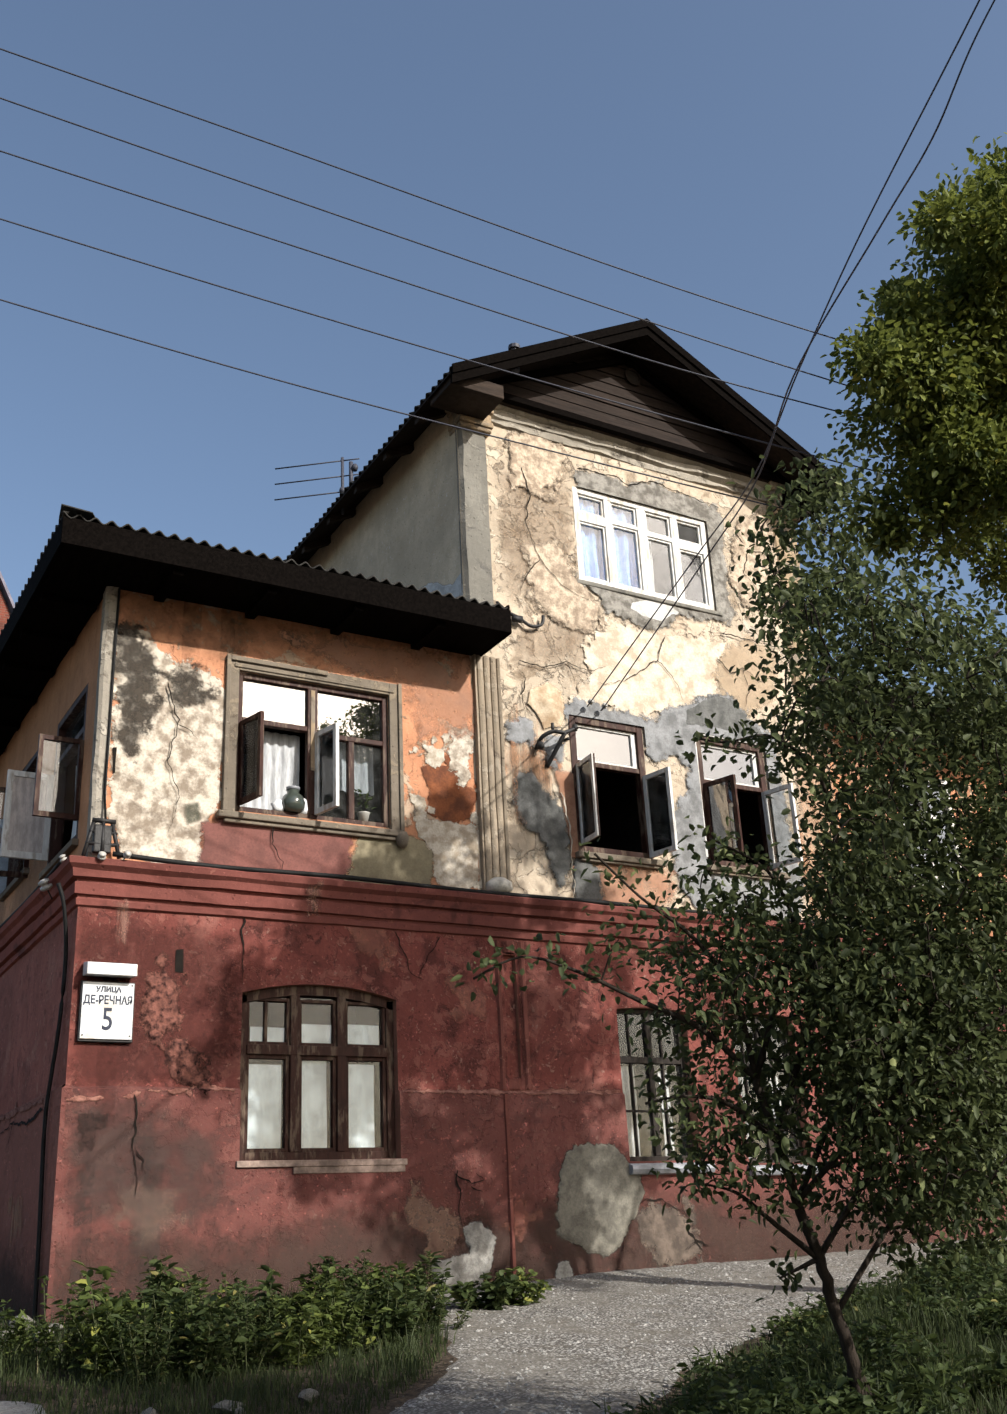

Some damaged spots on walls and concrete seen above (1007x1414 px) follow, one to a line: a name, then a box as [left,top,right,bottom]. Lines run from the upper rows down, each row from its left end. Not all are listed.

crack [519,467,590,601]
crack [577,468,776,591]
crack [519,637,683,709]
crack [718,633,780,710]
peeling [106,629,225,864]
peeling [280,630,482,890]
peeling [551,758,579,869]
peeling [598,864,675,907]
crack [0,1108,42,1142]
spalling [636,1195,703,1268]